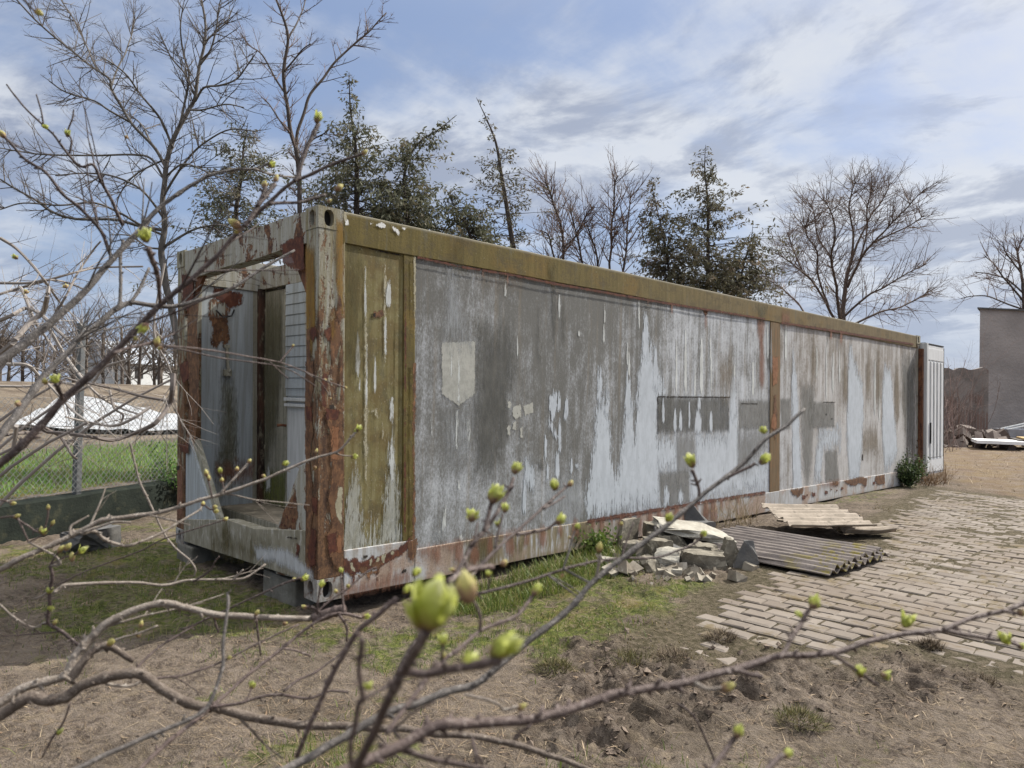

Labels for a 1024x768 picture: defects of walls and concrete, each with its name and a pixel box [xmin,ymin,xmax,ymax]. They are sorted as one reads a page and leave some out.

rust [179,274,244,454]
leakage [446,356,473,451]
rust [278,222,779,583]
leakage [663,485,683,508]
leakage [662,330,735,472]
leakage [738,426,766,474]
leakage [812,340,847,400]
rust [791,474,885,499]
leakage [863,358,881,452]